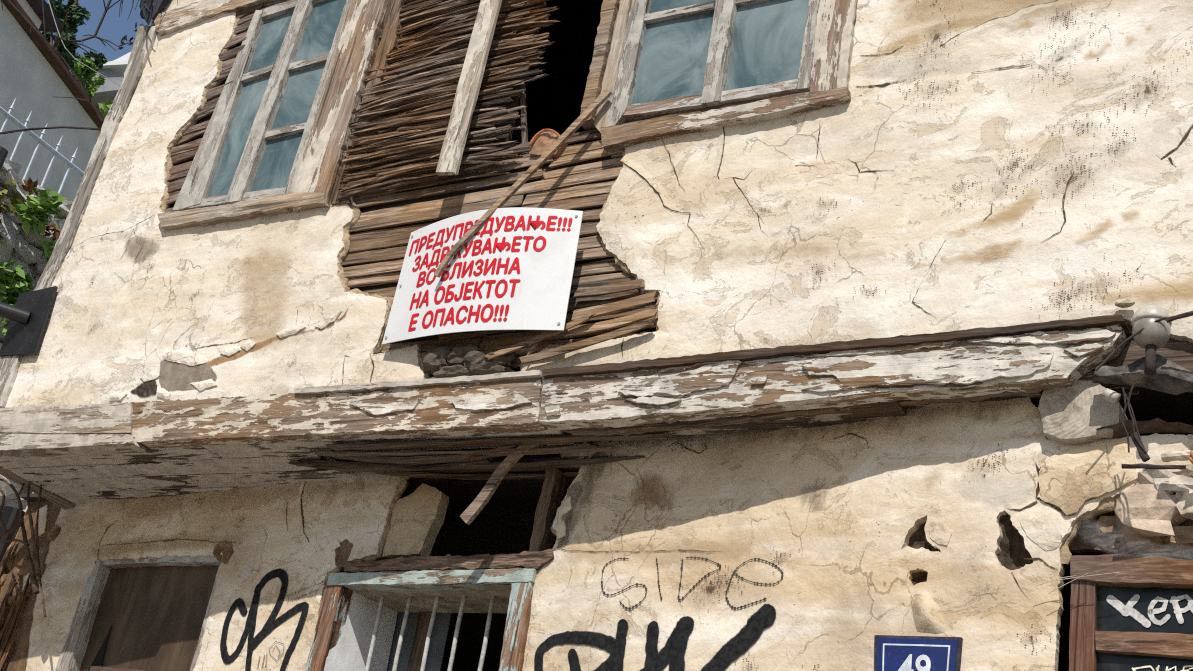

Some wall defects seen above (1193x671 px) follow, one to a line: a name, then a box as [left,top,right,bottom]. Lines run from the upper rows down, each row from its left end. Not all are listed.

crack [856,79,906,87]
damp [885,1,963,110]
damp [1022,3,1114,94]
crack [795,130,893,173]
crack [1154,103,1193,167]
crack [620,127,765,257]
crack [1040,172,1079,243]
spalling [109,311,345,402]
peeling [617,360,742,406]
peeling [801,328,1116,393]
spalling [908,522,941,553]
flaking render [997,438,1138,570]